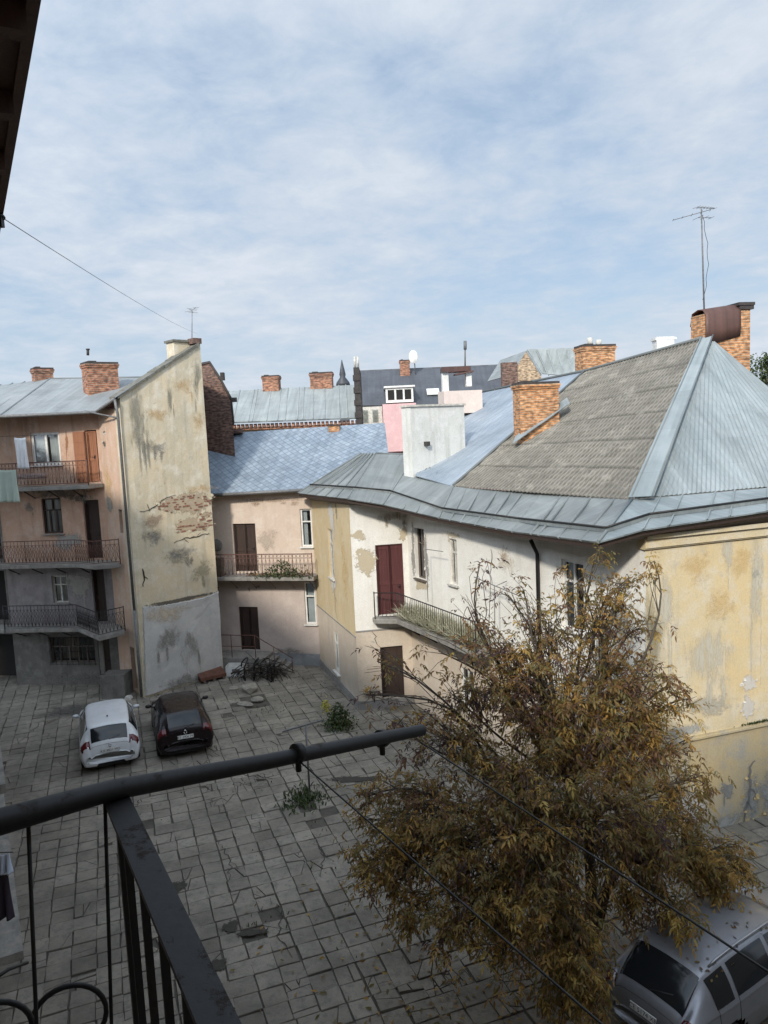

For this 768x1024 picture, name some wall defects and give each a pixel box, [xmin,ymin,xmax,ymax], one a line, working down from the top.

water stain [132,392,174,466]
flaking render [155,491,215,534]
flaking render [350,530,378,578]
water stain [666,634,730,740]
peeling [739,674,758,719]
crack [743,760,756,822]